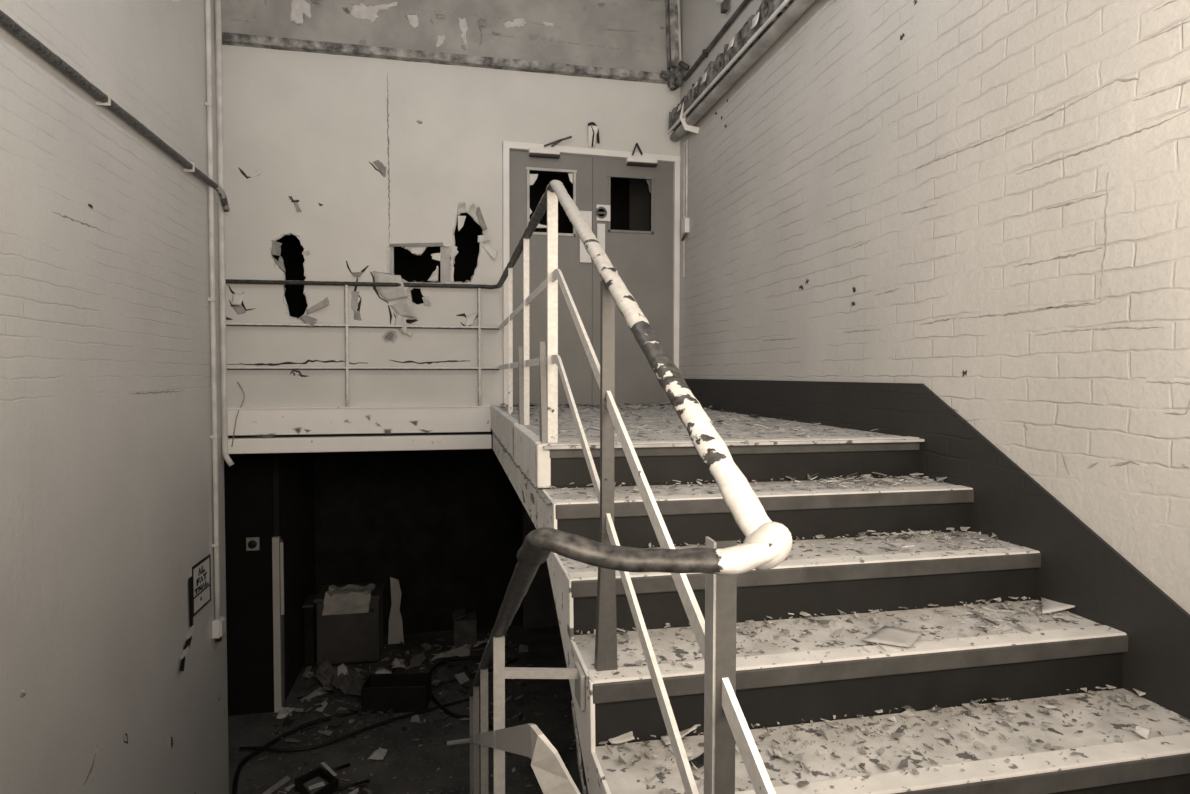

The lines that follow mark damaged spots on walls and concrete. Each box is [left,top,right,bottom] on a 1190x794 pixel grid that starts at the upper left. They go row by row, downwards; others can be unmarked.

peeling [342,1,527,50]
crack [917,77,1190,336]
crack [1146,381,1190,415]